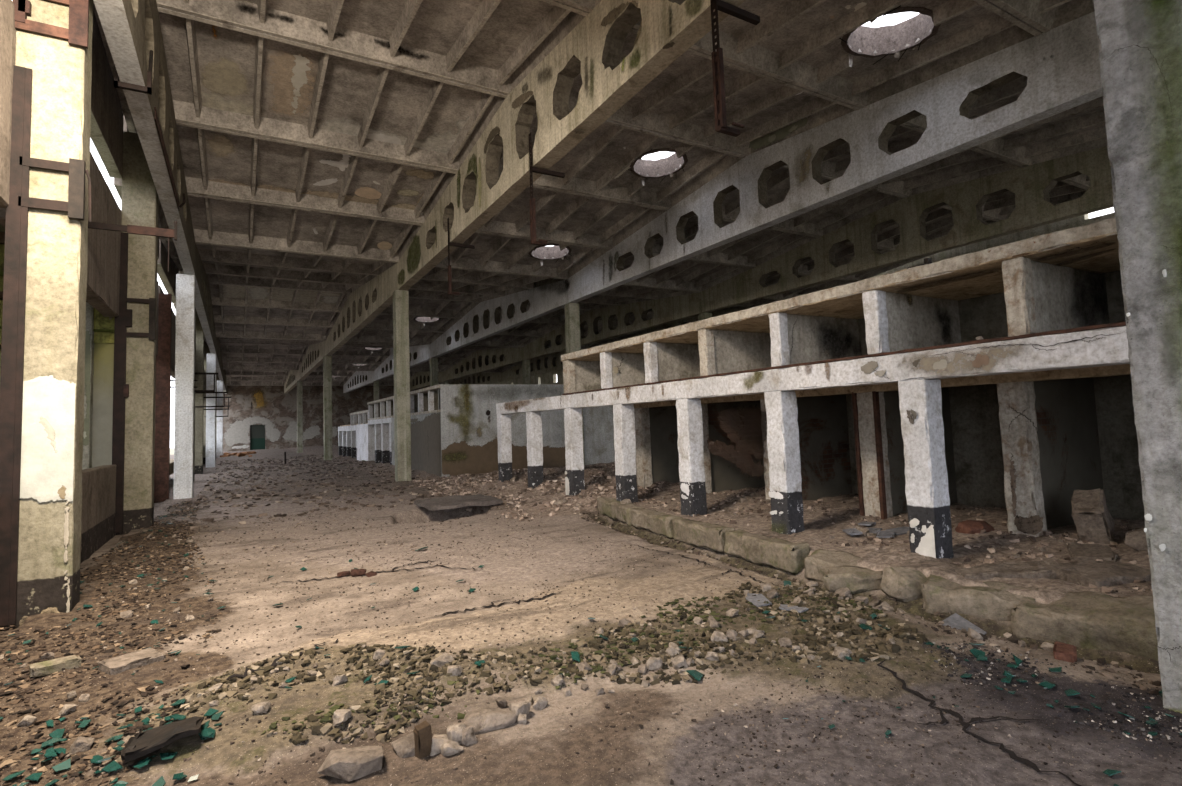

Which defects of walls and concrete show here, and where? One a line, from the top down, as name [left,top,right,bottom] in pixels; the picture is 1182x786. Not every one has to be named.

peeling [861,361,889,379]
peeling [903,345,1021,375]
peeling [19,331,91,627]
peeling [909,518,936,558]
crack [868,655,1082,786]